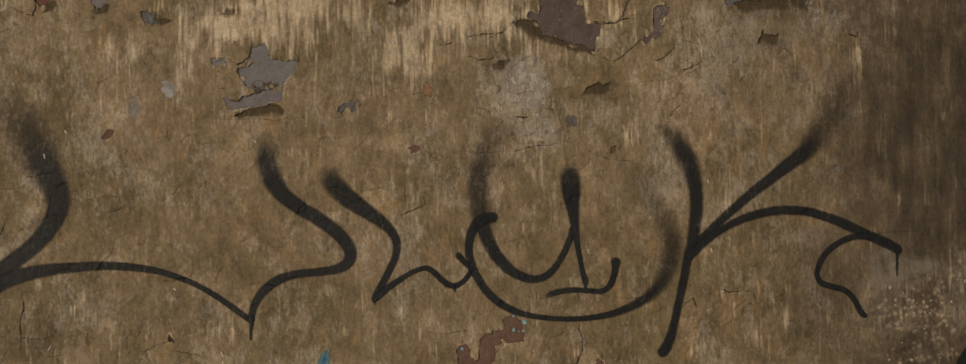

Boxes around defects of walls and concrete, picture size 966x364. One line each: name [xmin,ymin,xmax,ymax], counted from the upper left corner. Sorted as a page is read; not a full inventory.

peeling [213,10,248,42]
peeling [515,0,601,55]
peeling [643,0,670,44]
spalling [720,0,815,12]
peeling [211,44,299,118]
peeling [450,315,530,364]